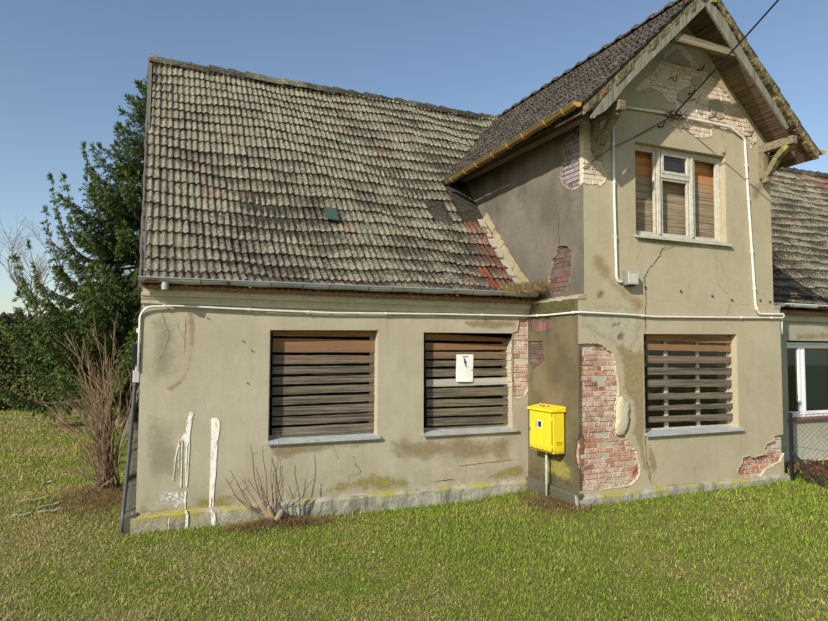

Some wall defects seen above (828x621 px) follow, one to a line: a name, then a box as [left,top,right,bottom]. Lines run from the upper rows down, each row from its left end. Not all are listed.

flaking render [631,44,761,149]
flaking render [559,116,608,191]
flaking render [547,245,572,294]
crack [644,245,675,333]
flaking render [510,317,554,400]
flaking render [576,342,641,491]
flaking render [737,434,784,478]